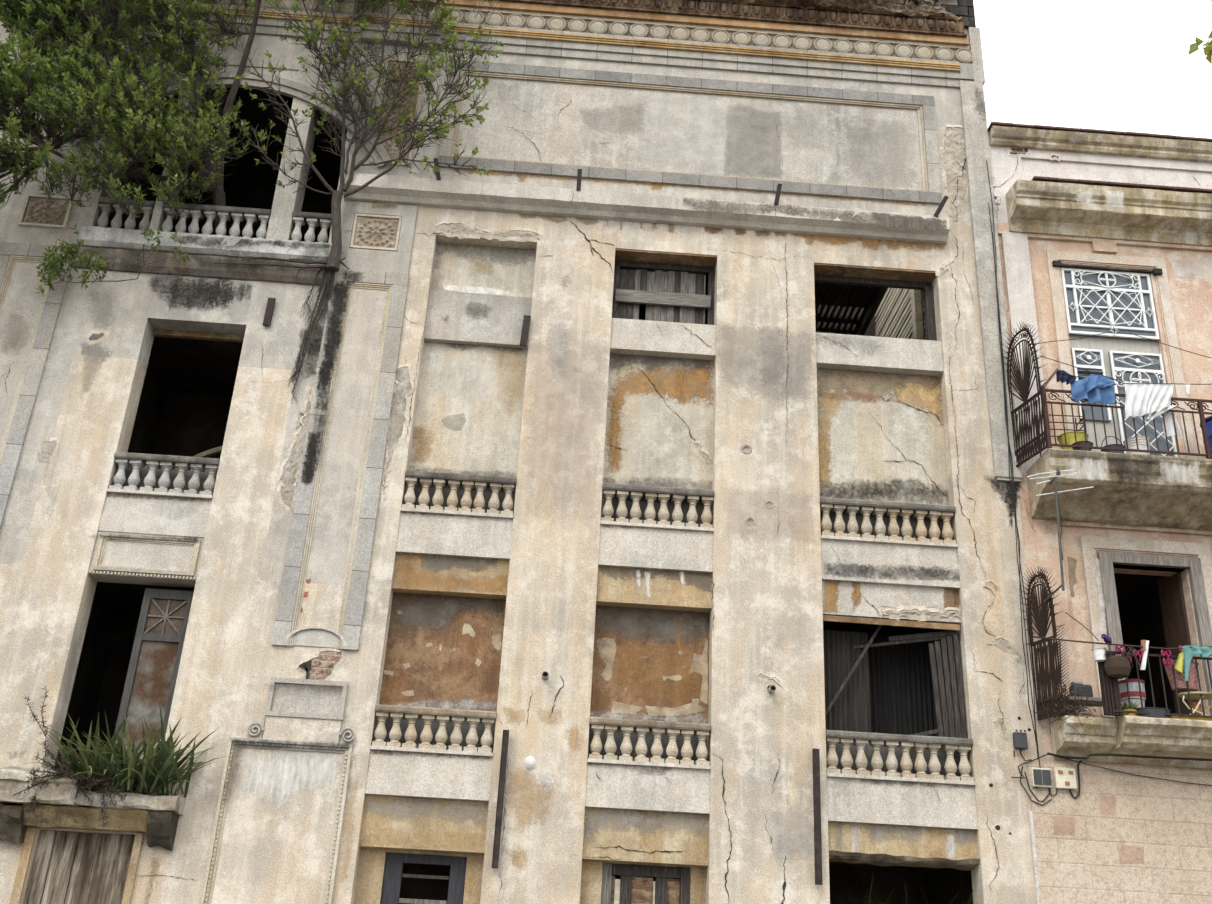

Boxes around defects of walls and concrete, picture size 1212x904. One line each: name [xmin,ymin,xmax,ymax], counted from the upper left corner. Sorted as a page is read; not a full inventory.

crack [570,191,614,272]
leakage [151,236,329,310]
leakage [294,273,359,483]
crack [636,365,712,461]
crack [868,138,1025,729]
leakage [820,480,948,501]
spalling [296,647,346,687]
peeling [462,623,475,638]
peeling [596,638,616,681]
peeling [611,640,708,716]
crack [718,756,732,898]
crack [765,758,786,904]